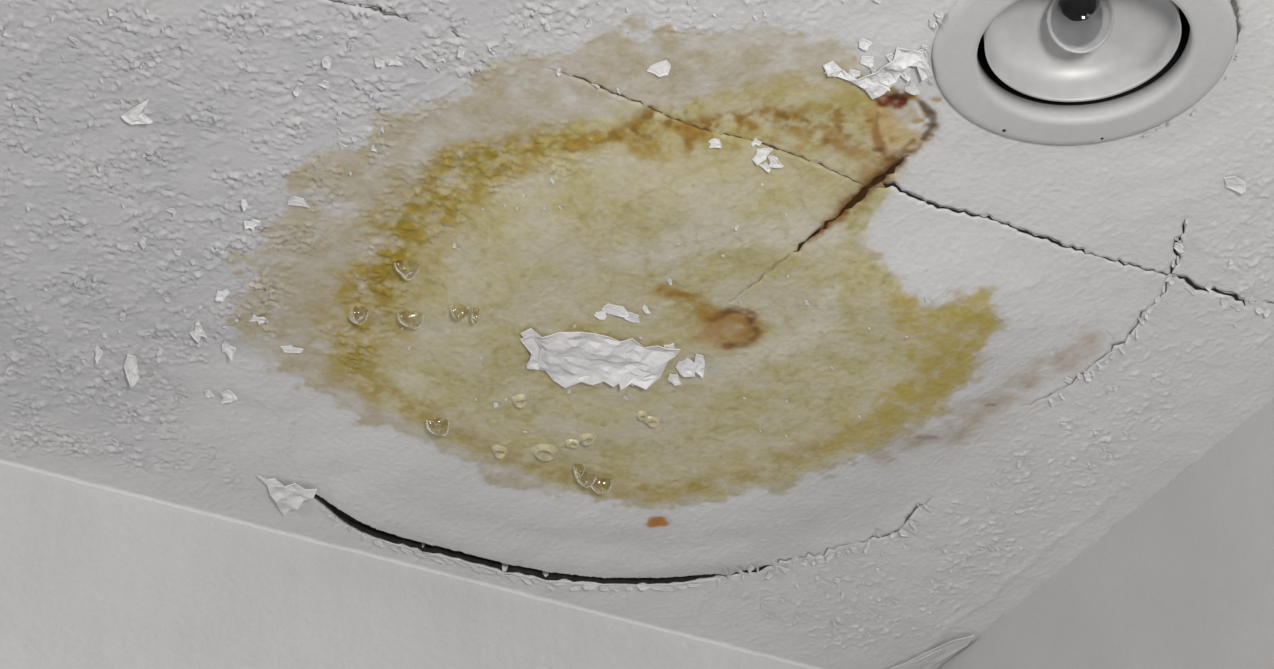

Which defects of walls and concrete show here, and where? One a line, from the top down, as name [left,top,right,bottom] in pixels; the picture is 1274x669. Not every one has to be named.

peeling [823,38,933,99]
peeling [520,303,712,401]
damp [214,14,1117,529]
corrosion [655,281,771,352]
crack [549,68,1272,406]
peeling [257,475,317,515]
crack [314,494,933,592]